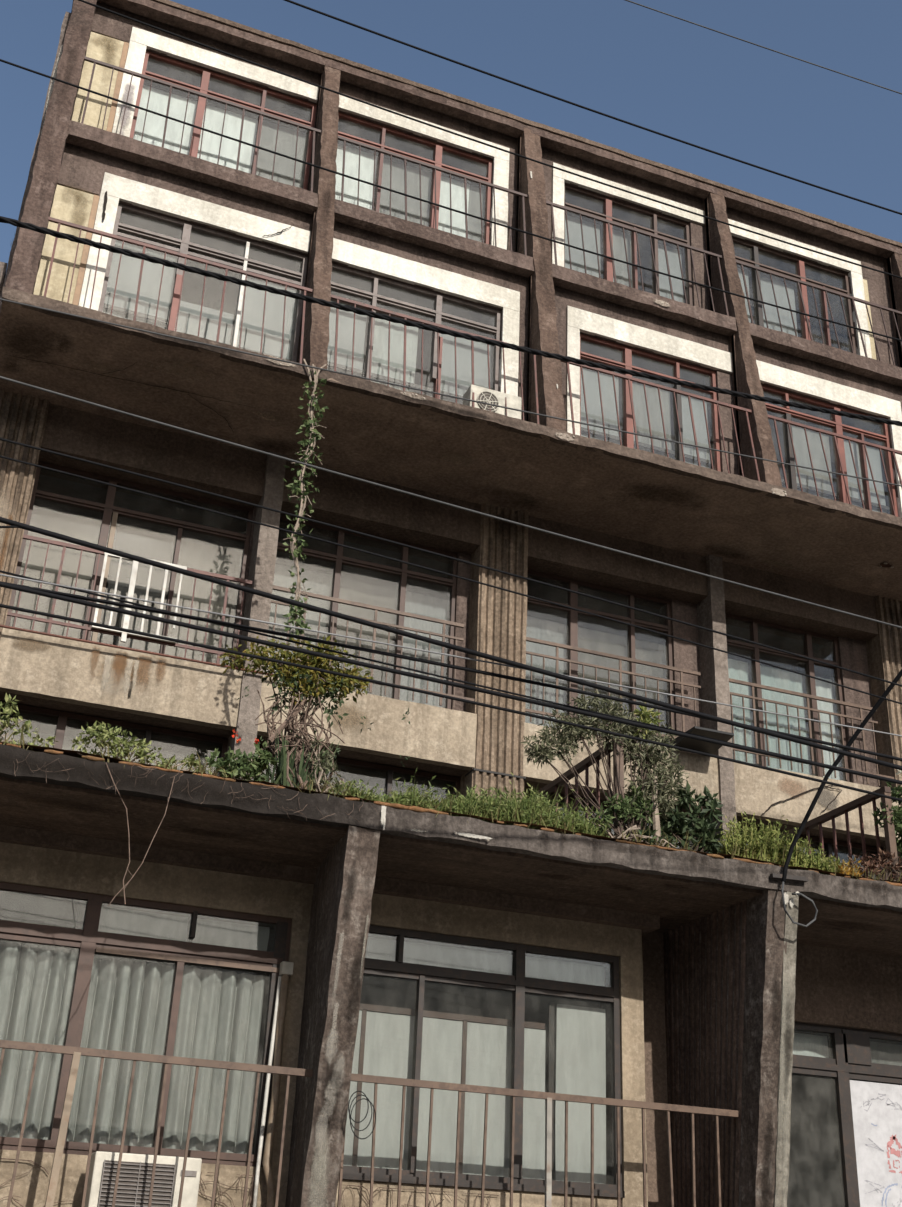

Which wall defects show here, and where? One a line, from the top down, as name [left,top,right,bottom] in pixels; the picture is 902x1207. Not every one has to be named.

leakage [103,656,113,685]
leakage [125,661,139,688]